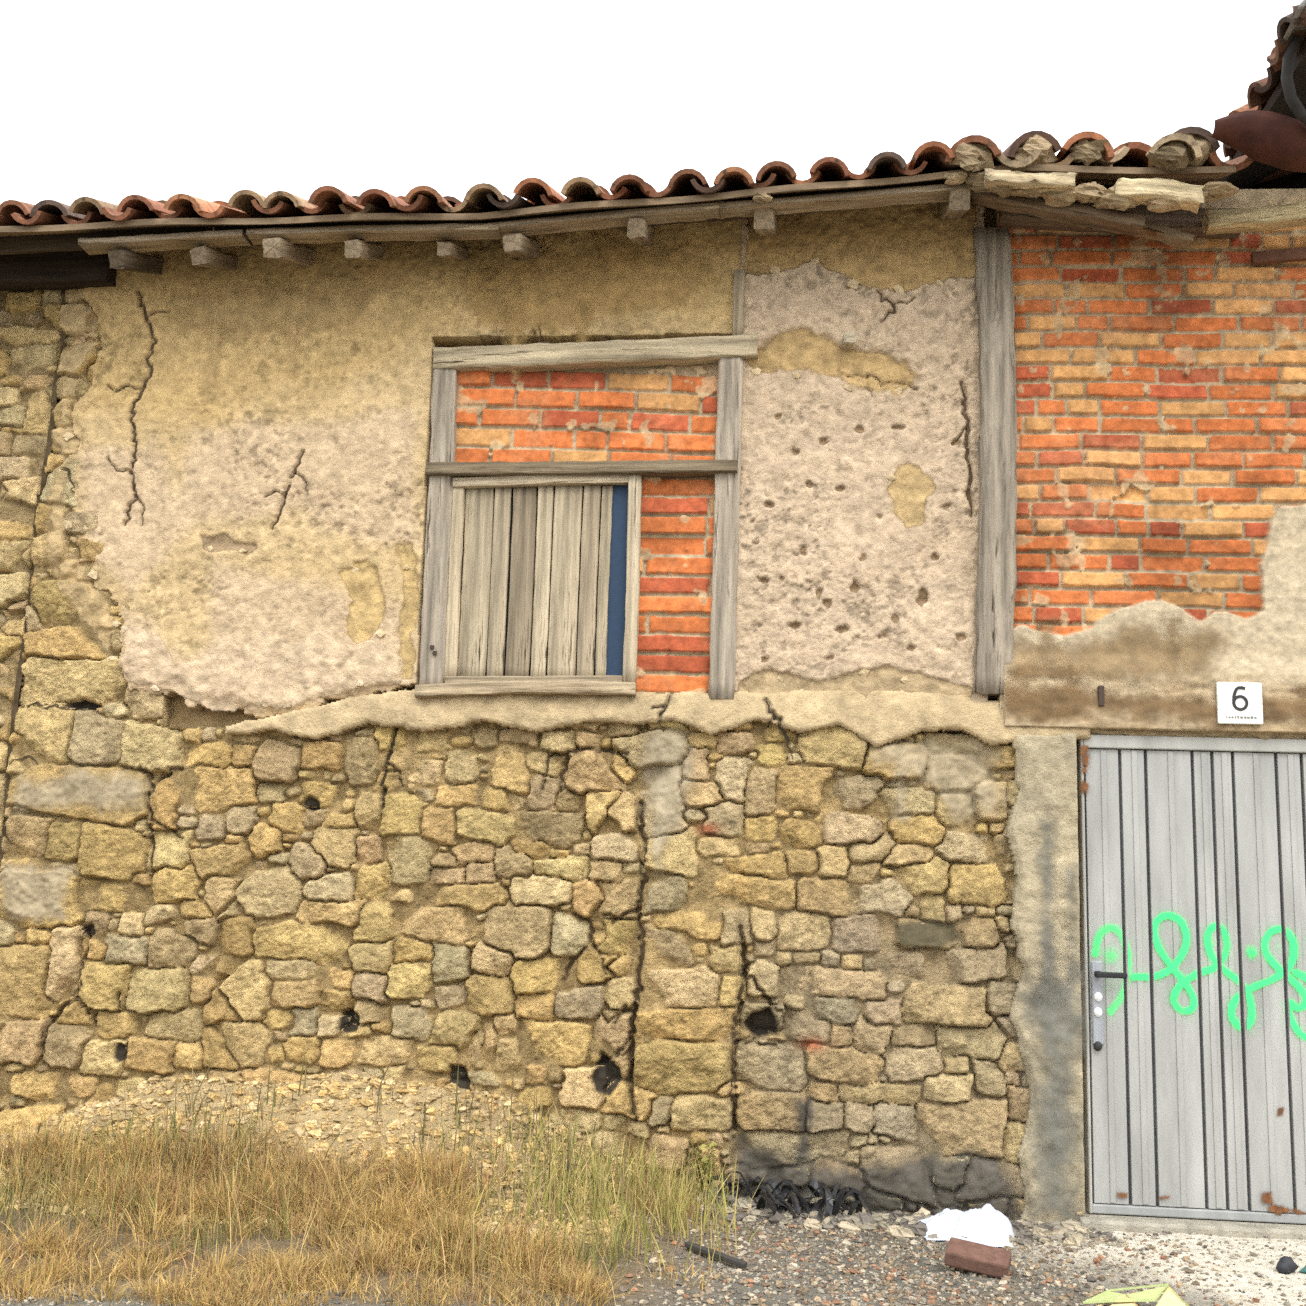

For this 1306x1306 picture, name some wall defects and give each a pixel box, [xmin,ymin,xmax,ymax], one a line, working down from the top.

crack [108,291,170,525]
flaking render [747,328,917,395]
crack [266,452,308,529]
crack [0,290,85,867]
leakage [1004,621,1218,722]
leakage [1262,688,1306,721]
crack [564,804,648,1120]
corrosion [1262,1192,1305,1215]